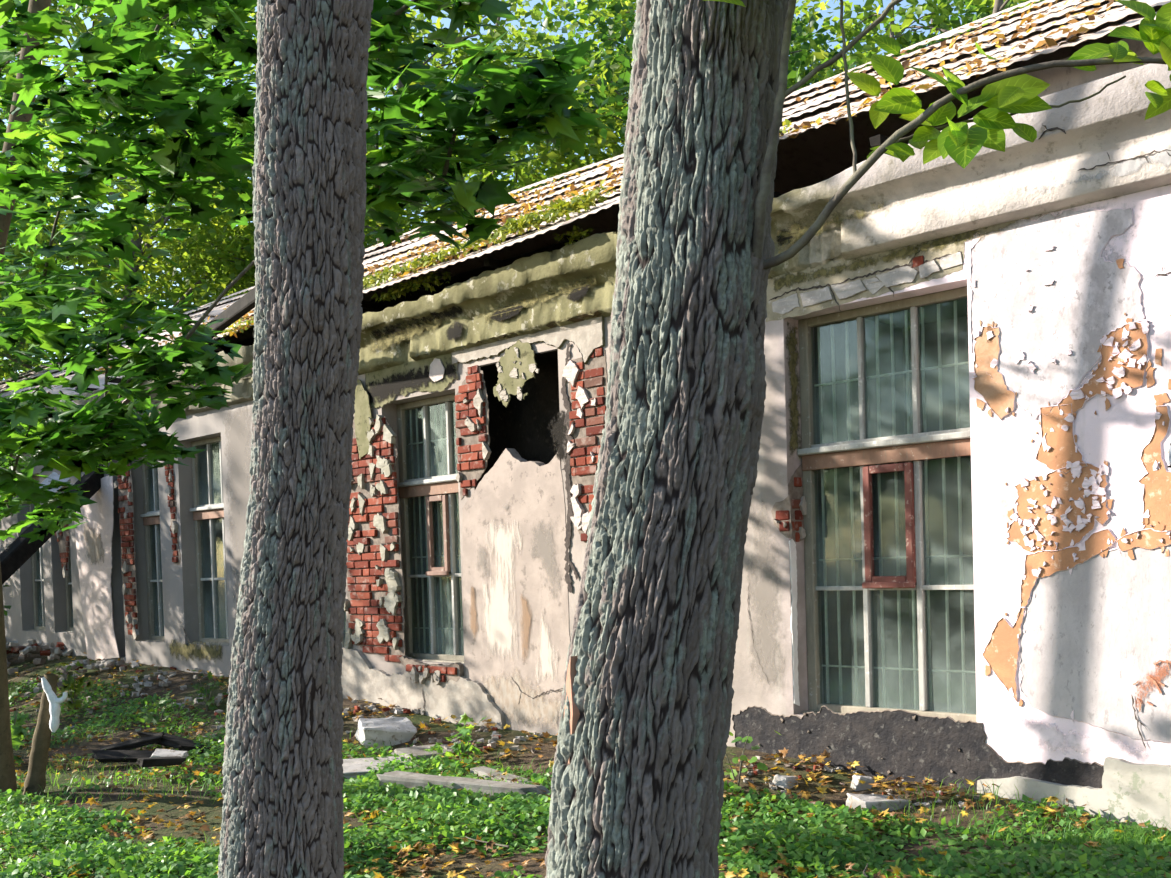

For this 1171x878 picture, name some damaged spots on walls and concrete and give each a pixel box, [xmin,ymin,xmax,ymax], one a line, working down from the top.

crack [1078,149,1171,171]
water stain [370,318,440,353]
water stain [366,362,456,405]
water stain [485,277,596,323]
water stain [498,311,602,341]
spalling [114,463,140,640]
spalling [165,464,181,565]
spalling [344,306,608,685]
peeling [766,207,1171,743]
spalling [732,464,1104,791]